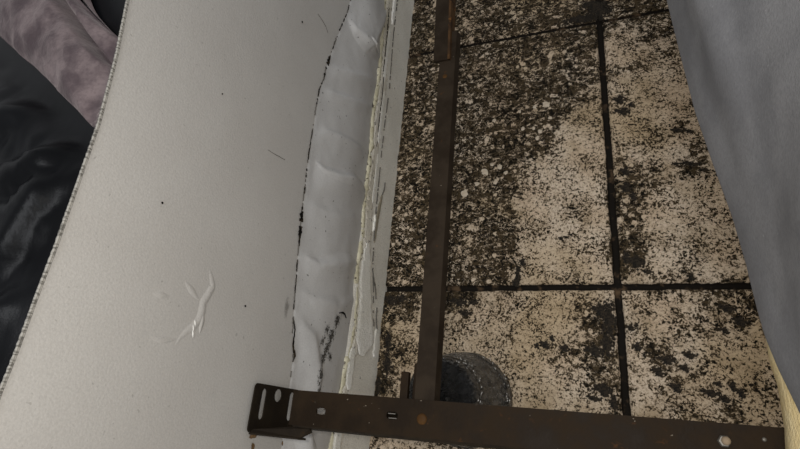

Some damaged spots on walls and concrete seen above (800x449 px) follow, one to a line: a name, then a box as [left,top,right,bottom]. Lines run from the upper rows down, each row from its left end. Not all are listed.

leakage [612,95,633,116]
crack [290,0,351,377]
leakage [618,166,637,201]
leakage [512,257,527,287]
leakage [317,312,346,392]
leakage [375,327,394,395]
leakage [533,334,572,352]
leakage [583,294,639,363]
leakage [632,341,699,394]
leakage [718,303,750,335]
leakage [586,382,618,415]
leakage [698,381,747,404]